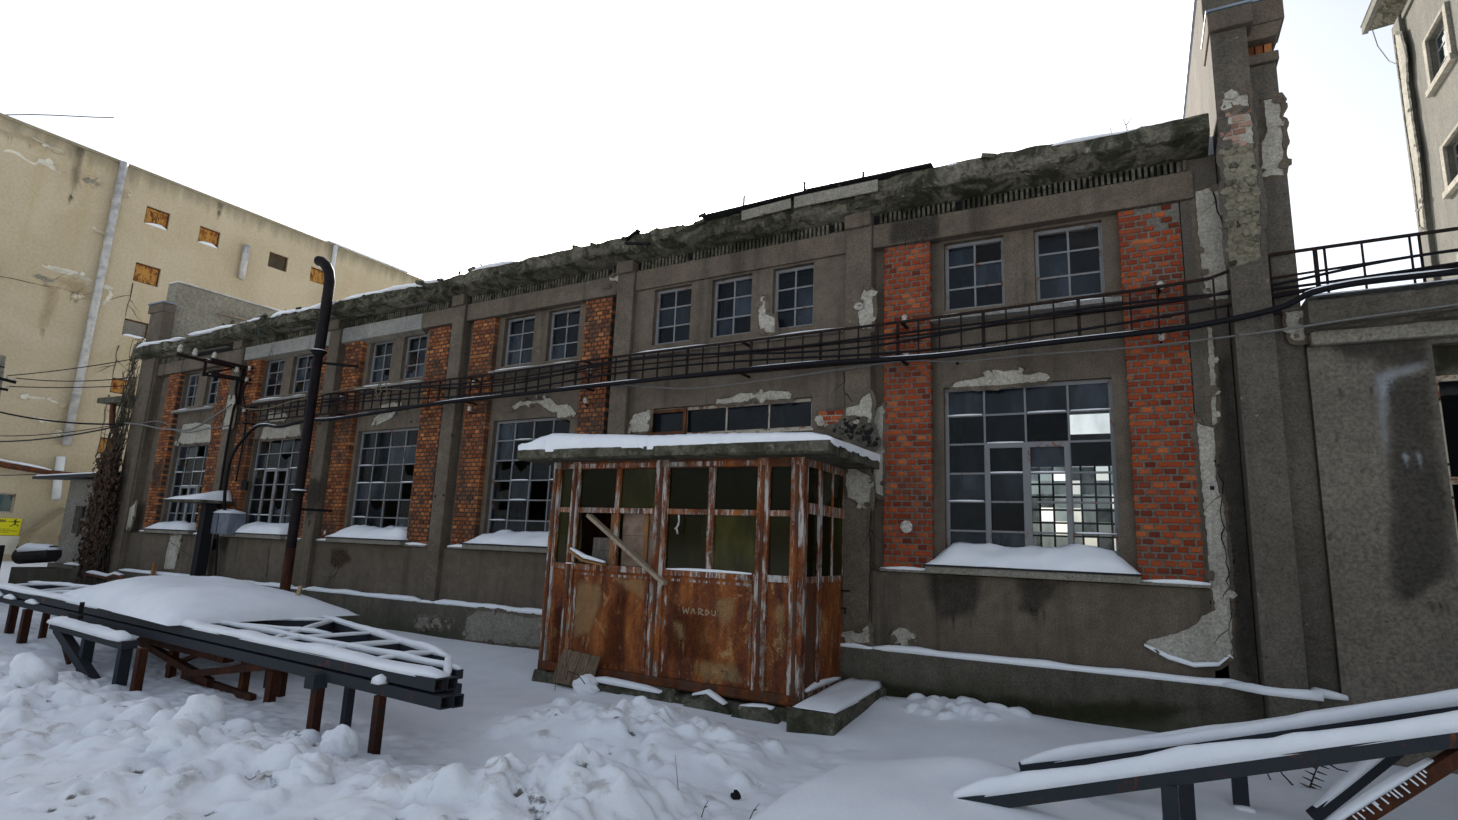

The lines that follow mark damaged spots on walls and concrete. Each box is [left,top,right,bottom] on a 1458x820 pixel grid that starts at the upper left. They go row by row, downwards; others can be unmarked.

spalling [1191,85,1292,305]
peeling [755,294,779,336]
peeling [854,285,878,332]
peeling [508,393,578,420]
peeling [714,387,795,407]
peeling [946,365,1051,391]
leakage [1340,339,1458,596]
peeling [1140,326,1239,671]